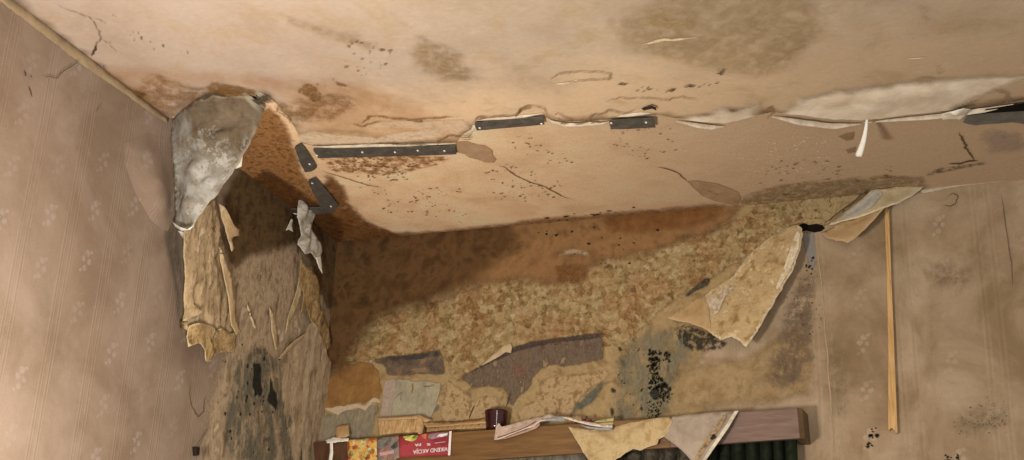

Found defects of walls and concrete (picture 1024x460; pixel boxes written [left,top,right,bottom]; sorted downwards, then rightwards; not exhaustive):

crack [25,11,111,96]
damp [133,78,350,123]
crack [500,165,566,198]
crack [950,134,977,165]
peeling [321,180,859,442]
damp [223,161,980,383]
damp [224,338,302,460]
damp [574,326,726,420]